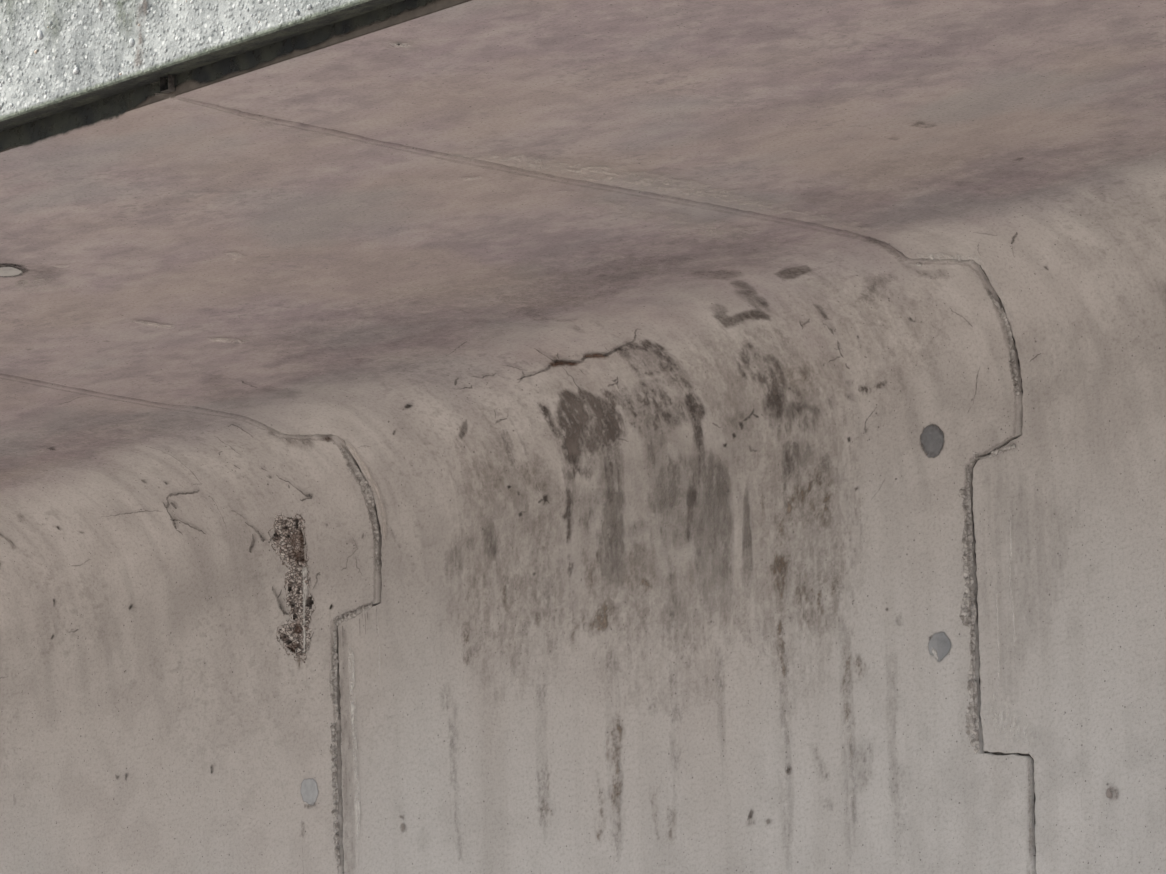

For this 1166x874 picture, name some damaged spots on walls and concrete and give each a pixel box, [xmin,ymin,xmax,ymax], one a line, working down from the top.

crack [455,334,636,391]
damp [620,340,676,370]
damp [742,345,816,431]
damp [539,369,751,570]
spalling [268,513,319,666]